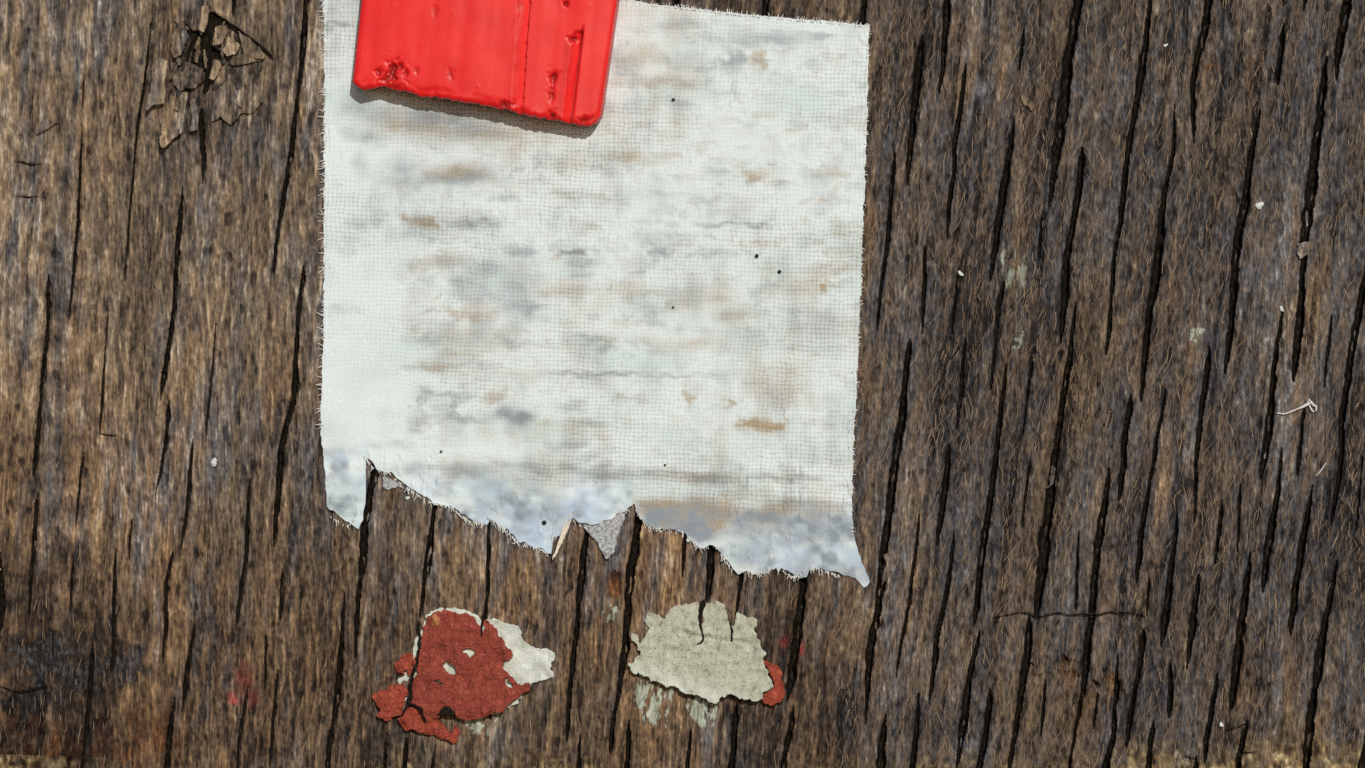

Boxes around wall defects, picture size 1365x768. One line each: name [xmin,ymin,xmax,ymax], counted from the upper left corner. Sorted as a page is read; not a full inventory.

crack [0,74,85,632]
crack [75,310,113,526]
crack [236,0,309,768]
peeling [372,607,555,744]
peeling [628,593,786,706]
crack [865,0,1365,768]